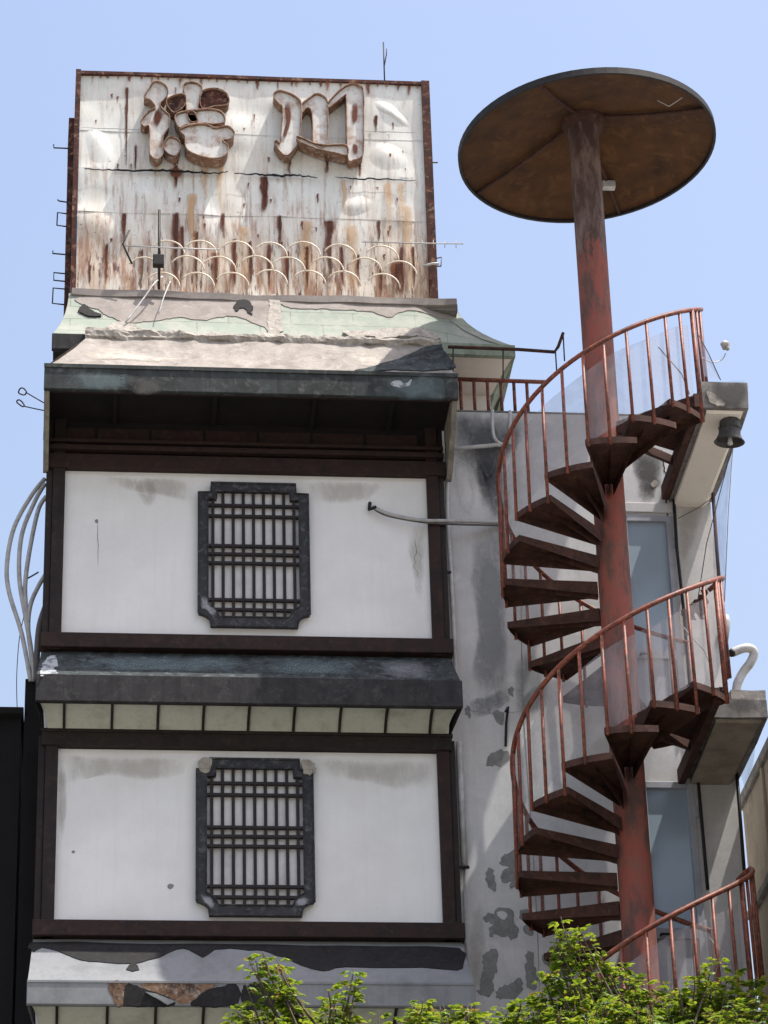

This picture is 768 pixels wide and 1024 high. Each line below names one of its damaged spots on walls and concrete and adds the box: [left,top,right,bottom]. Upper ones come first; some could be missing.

corrosion [85,75,415,292]
peeling [75,296,452,330]
leakage [456,419,516,511]
spalling [485,850,516,892]
peeling [28,941,466,972]
spalling [476,907,564,999]